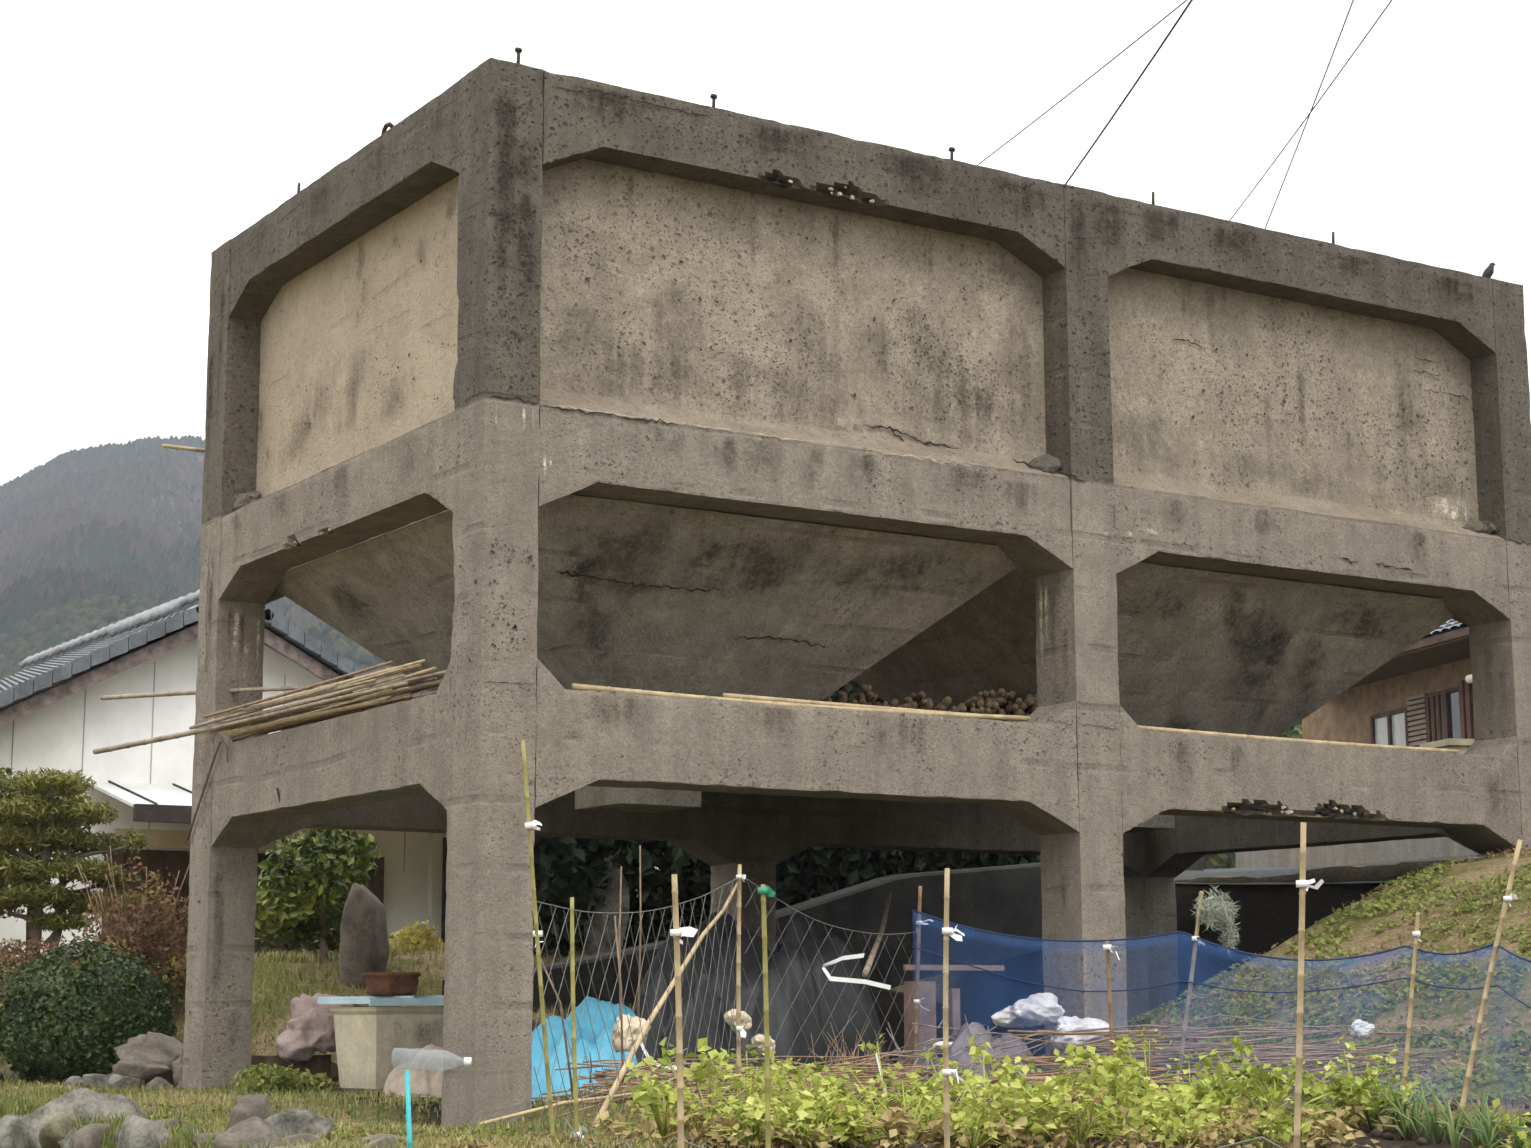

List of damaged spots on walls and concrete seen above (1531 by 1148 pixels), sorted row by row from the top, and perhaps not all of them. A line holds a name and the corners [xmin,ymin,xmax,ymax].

leakage [498,100,531,265]
crack [486,395,678,426]
crack [867,425,961,449]
crack [1011,458,1086,482]